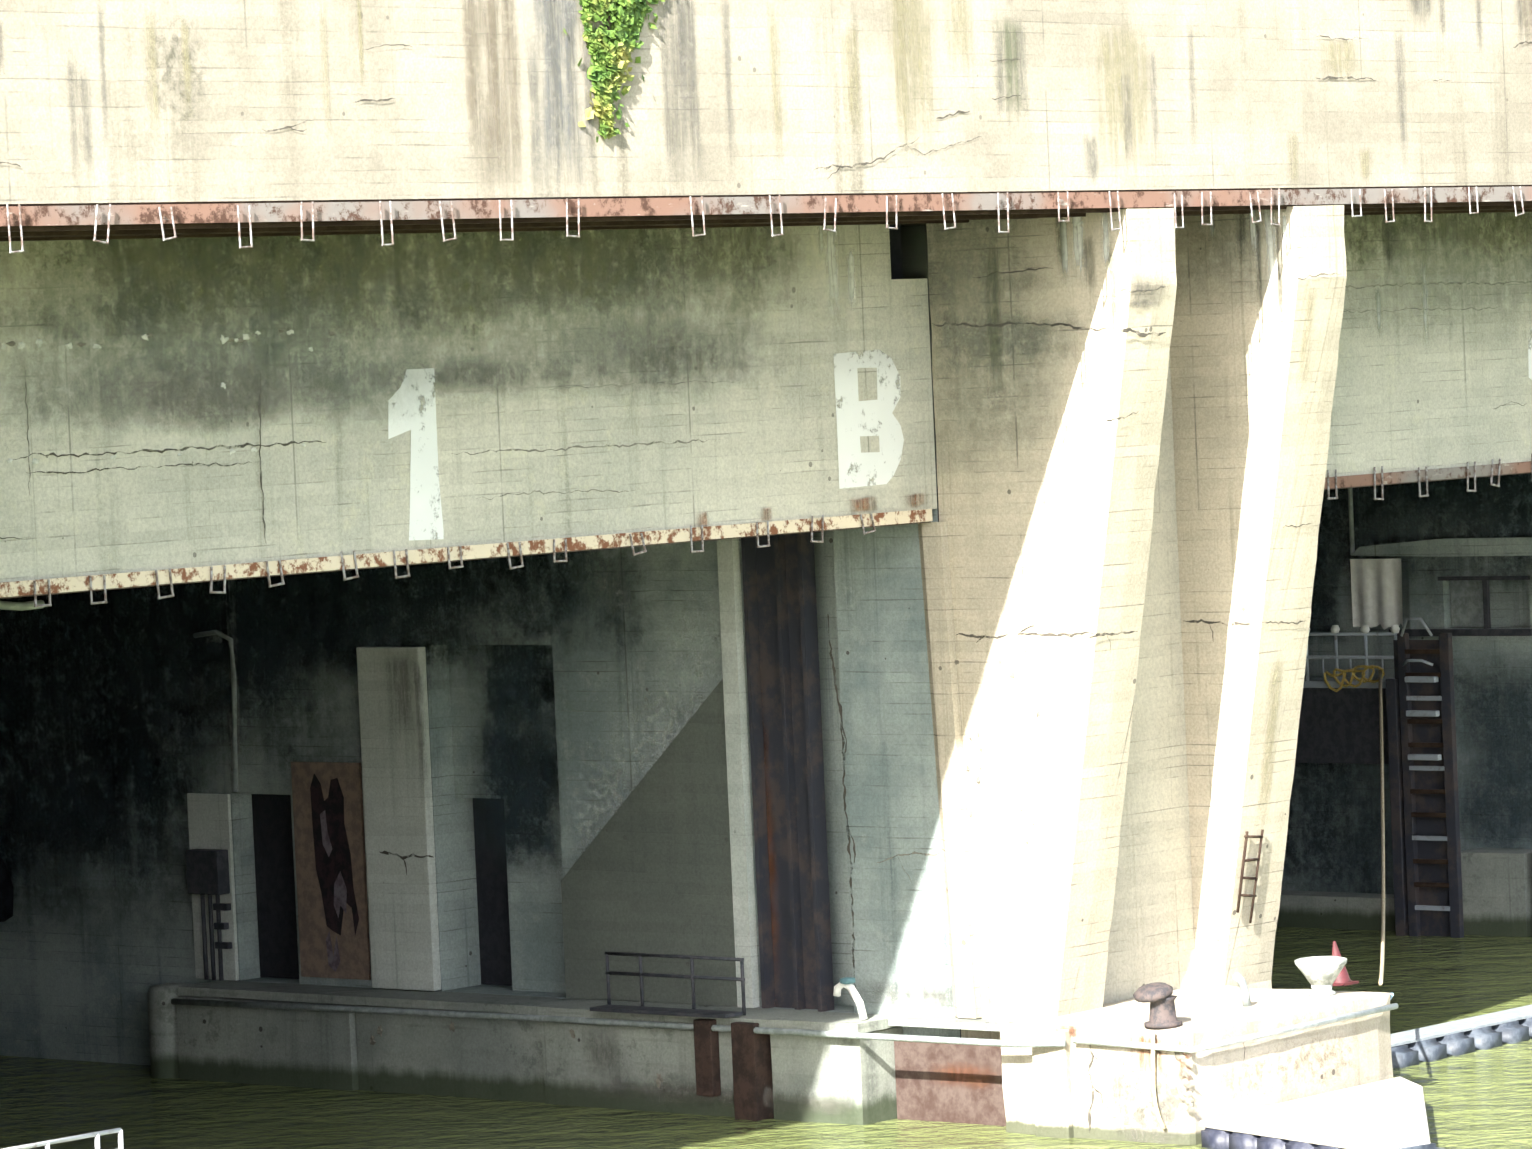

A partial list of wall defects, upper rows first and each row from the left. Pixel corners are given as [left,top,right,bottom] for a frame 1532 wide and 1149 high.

damp [467,0,517,134]
damp [543,0,574,138]
damp [1005,26,1018,101]
damp [425,365,513,384]
damp [621,335,715,378]
crack [20,372,325,545]
corrosion [856,498,869,510]
crack [955,625,1138,649]
crack [1185,619,1303,642]
corrosion [894,1041,1006,1126]